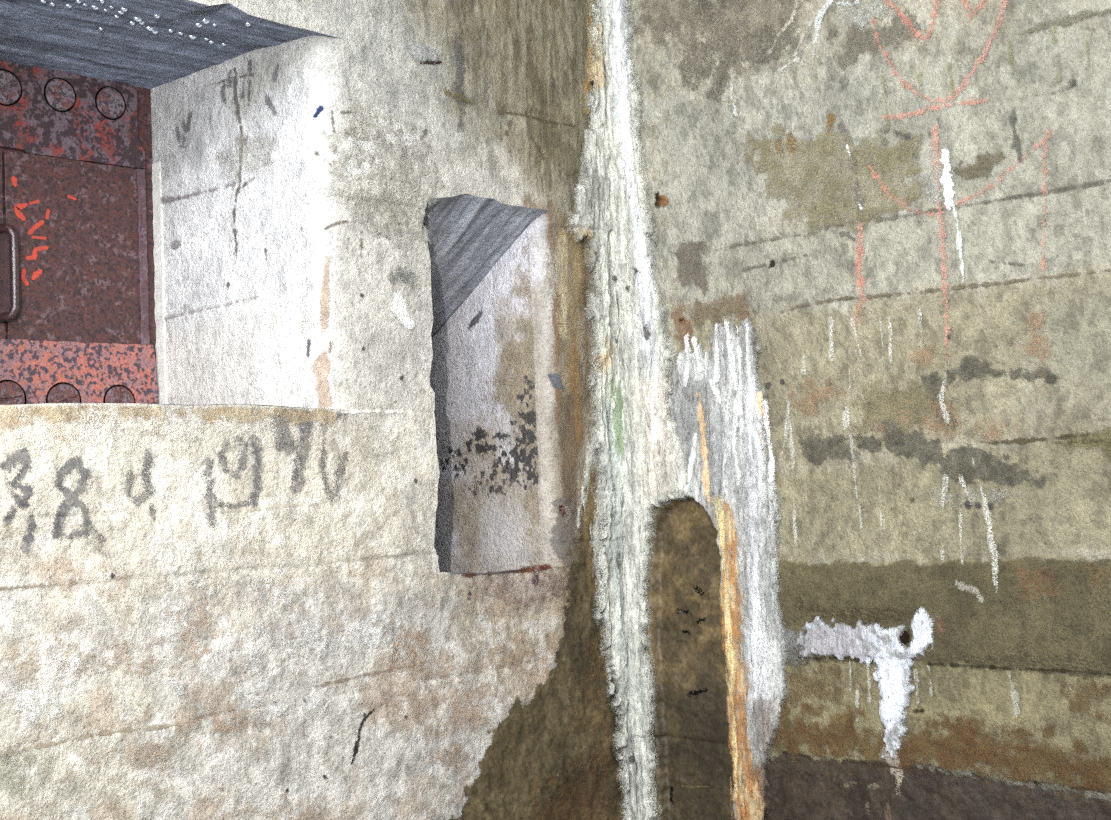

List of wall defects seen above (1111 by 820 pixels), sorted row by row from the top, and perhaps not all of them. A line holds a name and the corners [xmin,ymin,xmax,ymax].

water stain [440,0,1111,820]
corrosion [696,391,1111,820]
corrosion [785,372,1024,449]